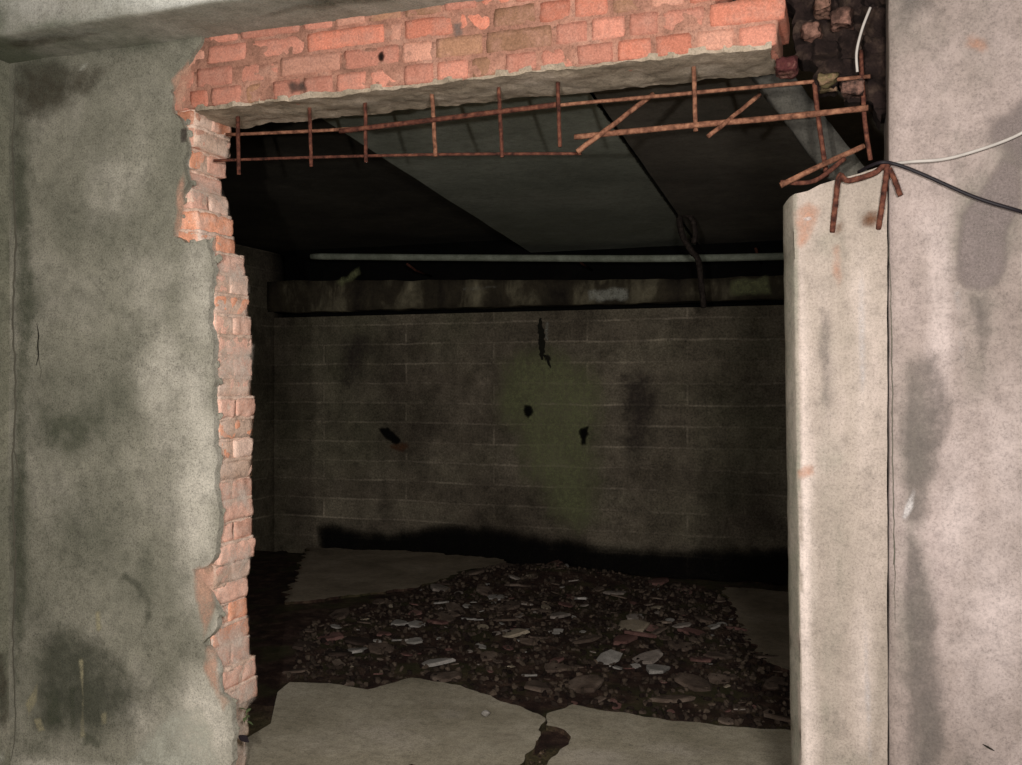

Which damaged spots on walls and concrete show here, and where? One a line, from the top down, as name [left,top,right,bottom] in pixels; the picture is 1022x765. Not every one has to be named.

flaking render [173,0,903,765]